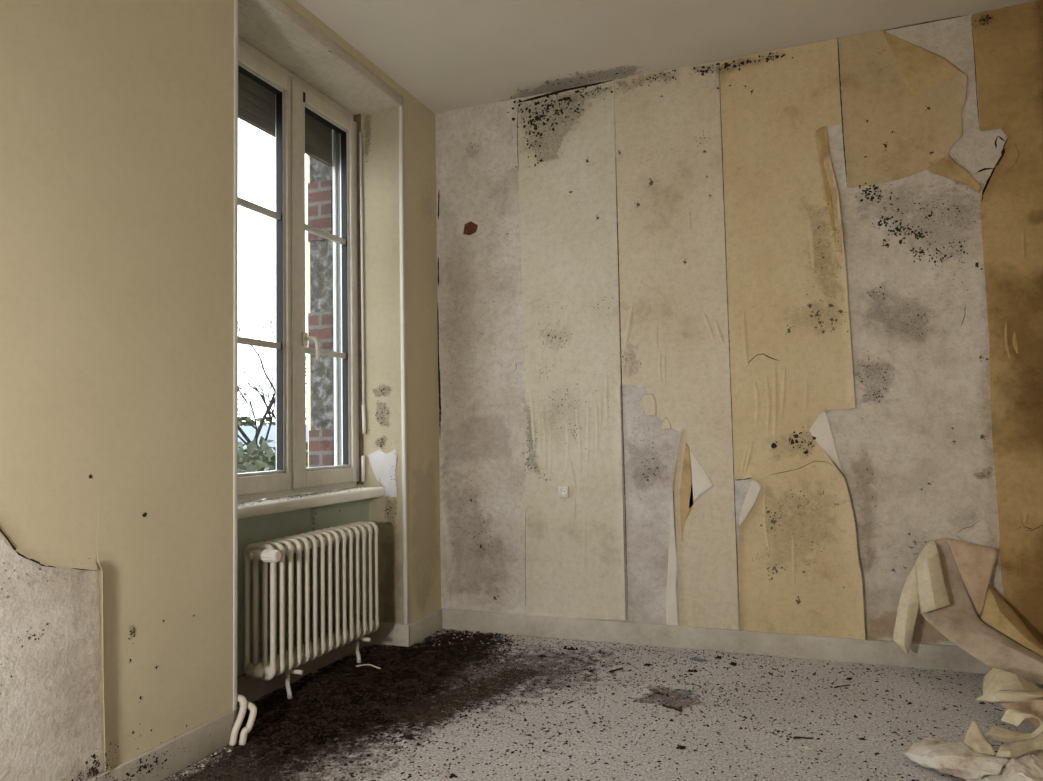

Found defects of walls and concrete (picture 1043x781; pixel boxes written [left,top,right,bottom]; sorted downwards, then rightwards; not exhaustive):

mould [507,67,676,167]
flaking render [827,14,1008,641]
leakage [856,182,983,306]
flaking render [620,383,681,625]
flaking render [734,473,764,547]
flaking render [0,534,104,781]